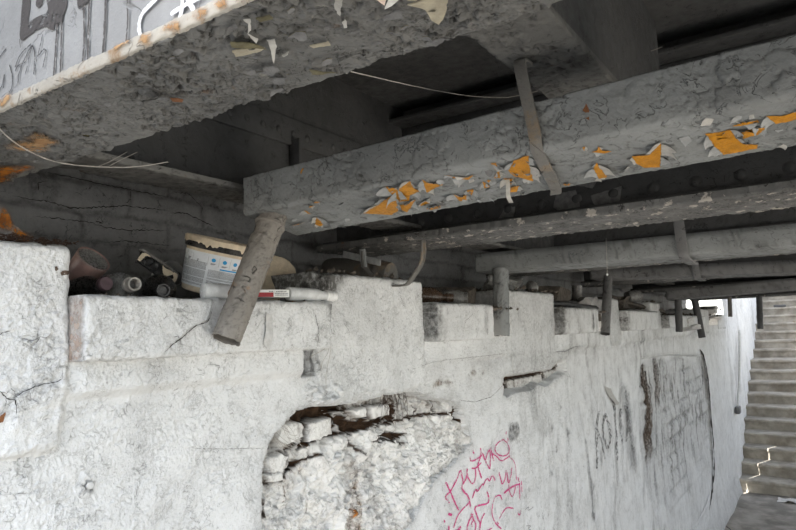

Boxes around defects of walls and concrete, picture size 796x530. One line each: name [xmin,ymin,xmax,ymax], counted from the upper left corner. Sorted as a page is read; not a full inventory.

corrosion [197,0,226,19]
peeling [369,0,472,47]
peeling [224,14,331,97]
corrosion [13,134,55,152]
peeling [679,111,796,157]
peeling [360,156,542,219]
peeling [553,143,678,210]
corrosion [0,209,29,241]
crack [1,370,63,413]
spalling [503,363,557,389]
crack [700,350,715,510]
spalling [261,393,473,530]